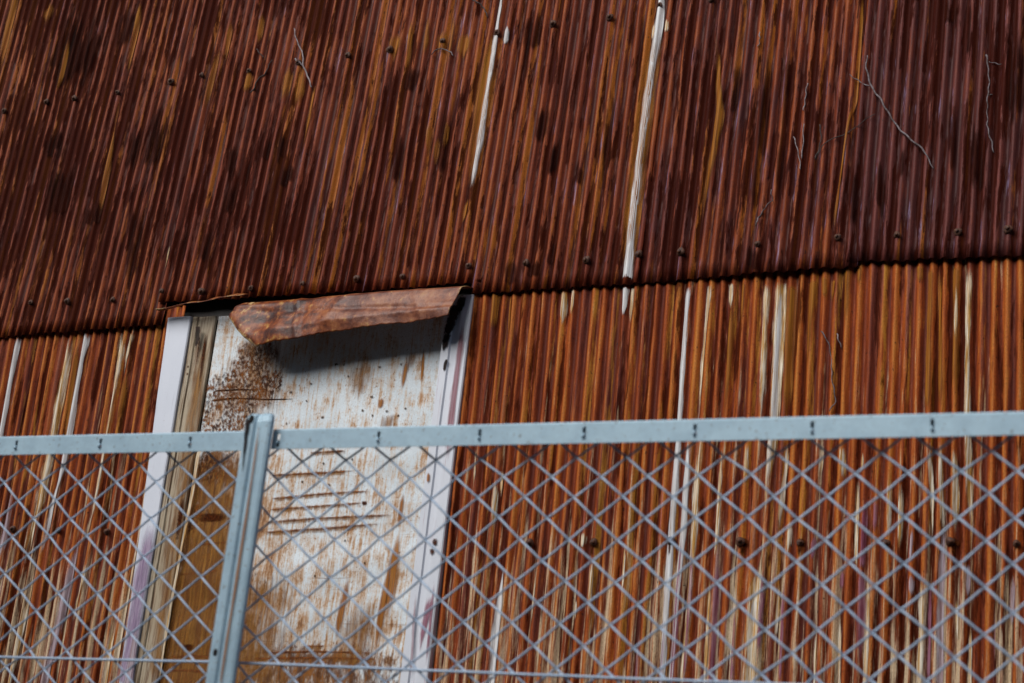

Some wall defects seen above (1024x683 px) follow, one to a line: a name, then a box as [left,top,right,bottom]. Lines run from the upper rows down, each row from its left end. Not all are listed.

rust [1,0,18,63]
rust [58,44,69,85]
rust [100,115,118,209]
rust [129,8,141,65]
rust [282,68,315,141]
rust [390,18,469,62]
rust [706,59,723,196]
rust [835,6,863,216]
rust [402,351,424,384]
rust [807,268,861,356]
rust [917,266,958,404]
rust [152,335,399,683]